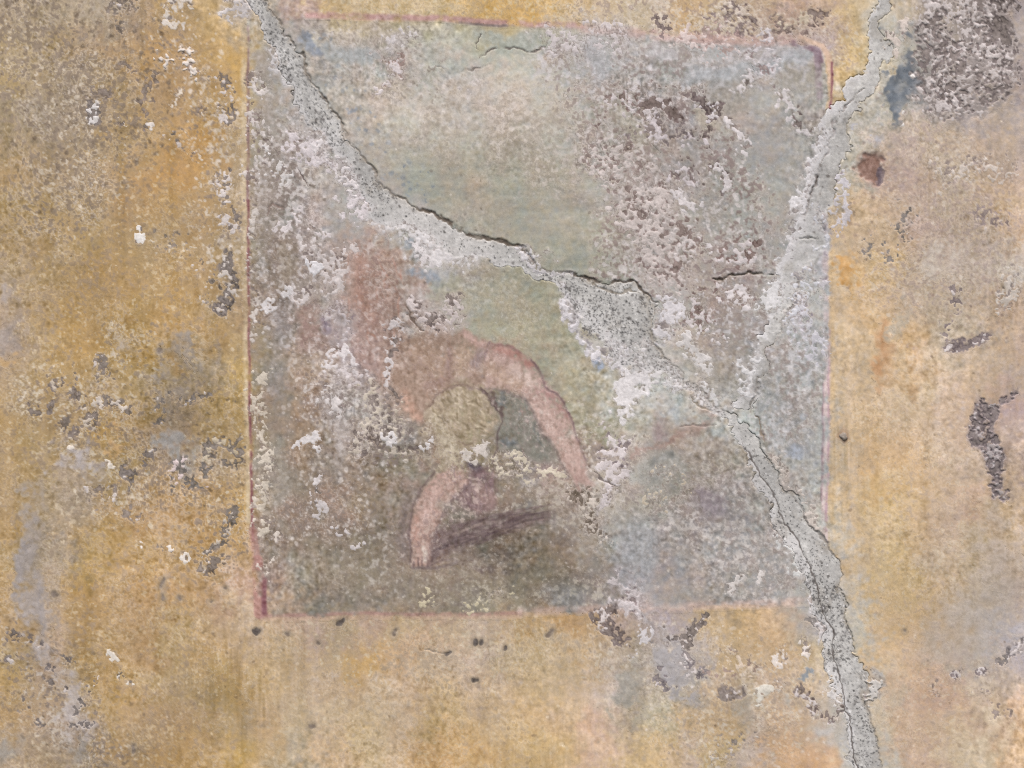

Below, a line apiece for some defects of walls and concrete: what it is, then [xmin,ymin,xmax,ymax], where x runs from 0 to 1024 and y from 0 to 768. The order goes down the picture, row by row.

flaking render [22,350,140,456]
peeling [73,363,326,595]
peeling [84,0,492,468]
crack [246,0,659,345]
crack [594,447,618,489]
peeling [458,0,1024,730]
crack [680,270,882,768]
crack [804,0,894,239]